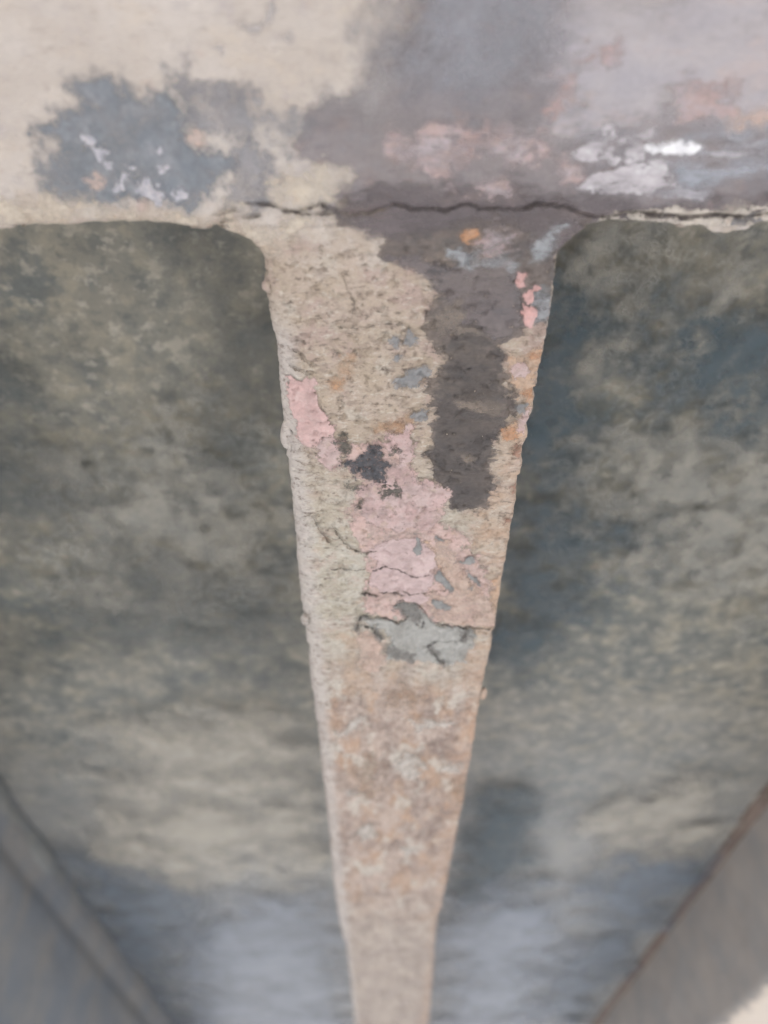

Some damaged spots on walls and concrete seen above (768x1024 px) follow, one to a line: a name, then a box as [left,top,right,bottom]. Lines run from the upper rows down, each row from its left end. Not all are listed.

water stain [0,0,768,686]
crack [218,203,768,225]
peeling [285,375,495,673]